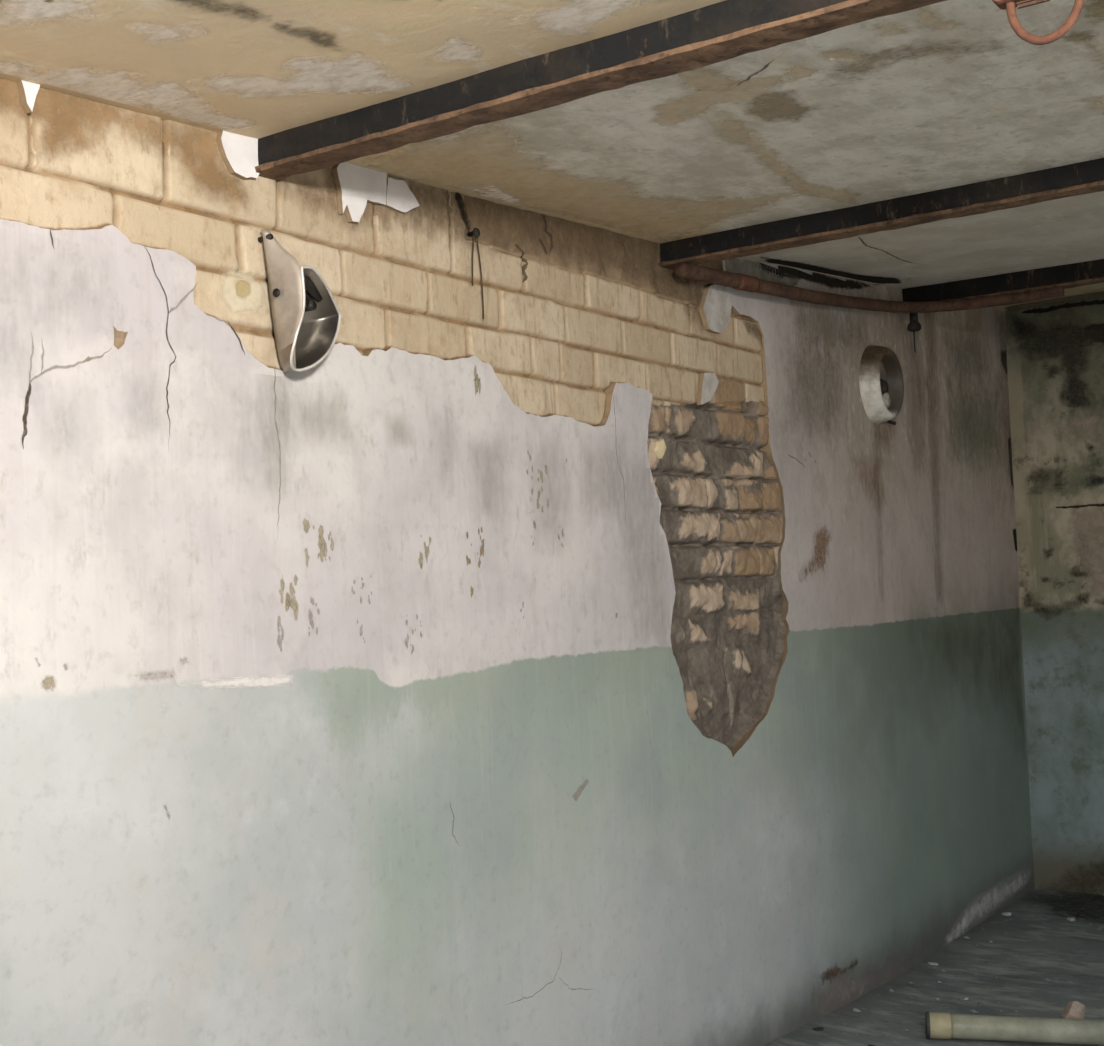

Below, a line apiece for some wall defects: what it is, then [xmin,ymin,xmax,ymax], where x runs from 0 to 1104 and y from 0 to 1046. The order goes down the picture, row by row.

peeling [0,0,93,25]
water stain [178,0,258,19]
peeling [532,0,632,33]
water stain [279,26,335,47]
water stain [838,47,969,74]
water stain [749,93,809,121]
water stain [761,257,901,284]
crack [144,246,198,441]
water stain [1005,291,1104,408]
crack [22,334,108,449]
flaking render [0,56,787,752]